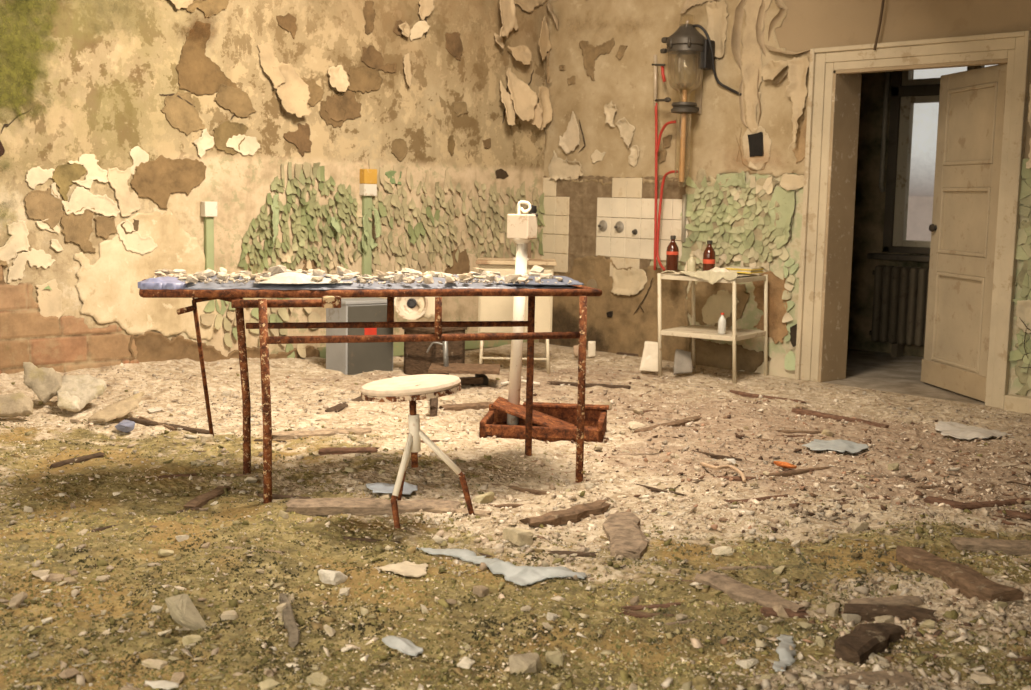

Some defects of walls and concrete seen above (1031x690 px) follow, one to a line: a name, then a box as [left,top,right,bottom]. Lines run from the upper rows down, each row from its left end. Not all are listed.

mould [0,0,57,121]
peeling [0,0,321,374]
peeling [238,0,810,373]
peeling [1009,84,1031,396]